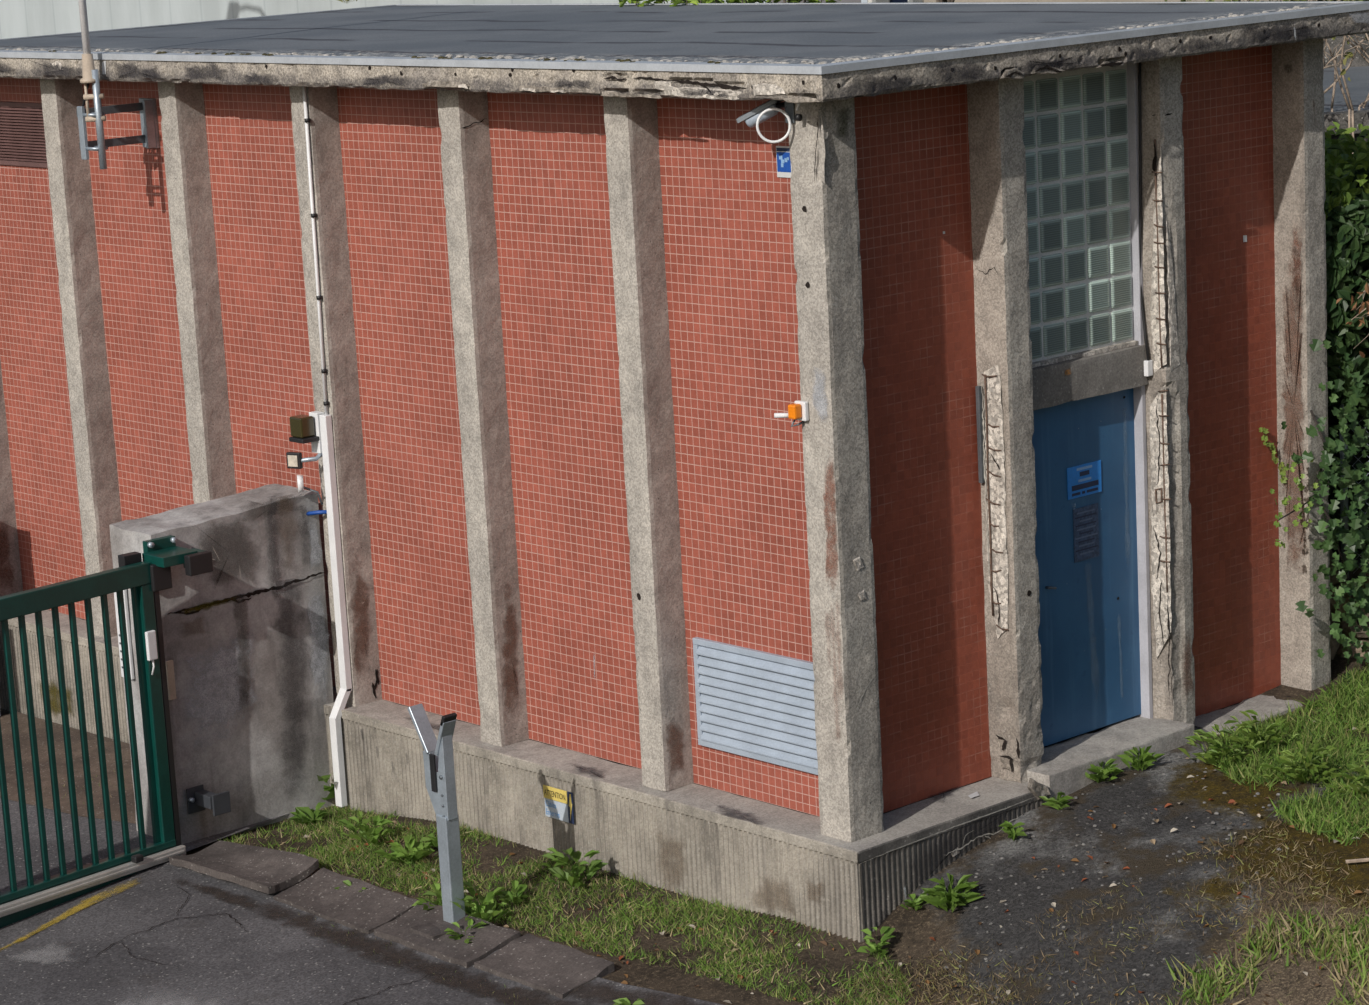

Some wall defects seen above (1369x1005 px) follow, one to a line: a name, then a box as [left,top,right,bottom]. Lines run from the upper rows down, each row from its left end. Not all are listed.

spalling [519,73,825,183]
crack [168,572,325,615]
damp [202,497,328,769]
corrosion [824,469,837,574]
spalling [981,365,1009,638]
spalling [1149,139,1180,697]